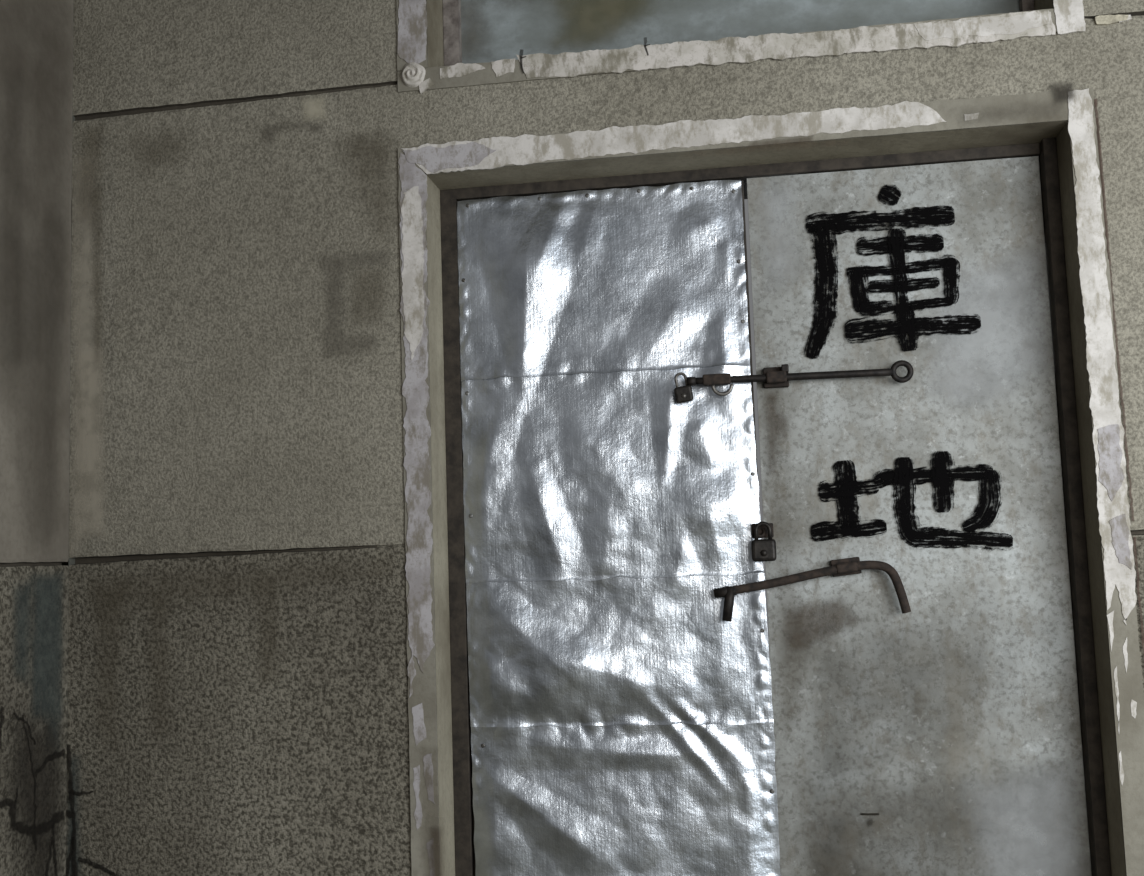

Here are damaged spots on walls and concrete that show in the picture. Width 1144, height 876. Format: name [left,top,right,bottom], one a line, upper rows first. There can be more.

peeling [1068,88,1137,732]
water stain [17,578,61,746]
crack [0,706,119,876]